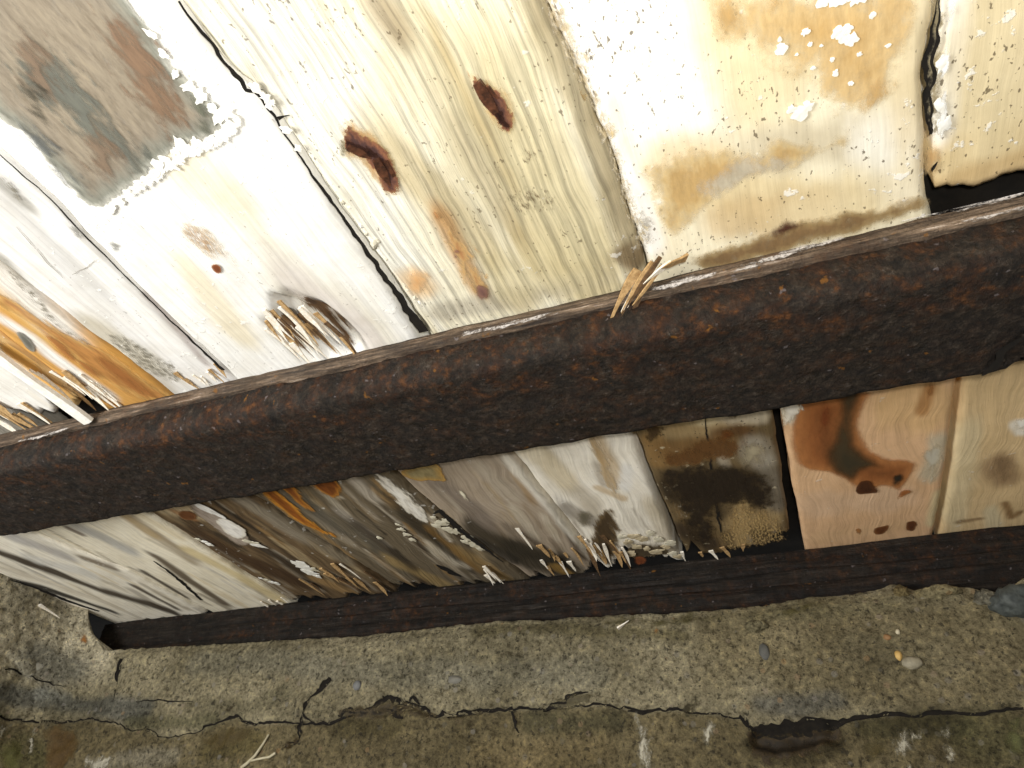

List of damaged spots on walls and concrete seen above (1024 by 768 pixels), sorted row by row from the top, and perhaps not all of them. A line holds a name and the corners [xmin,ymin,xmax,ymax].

leakage [717,0,914,106]
peeling [0,0,242,215]
corrosion [473,77,513,131]
corrosion [344,124,399,195]
leakage [652,141,812,232]
corrosion [697,198,925,268]
leakage [958,192,1024,221]
leakage [652,272,715,290]
corrosion [0,295,169,400]
leakage [783,393,941,497]
corrosion [263,487,337,538]
crack [0,659,1024,748]